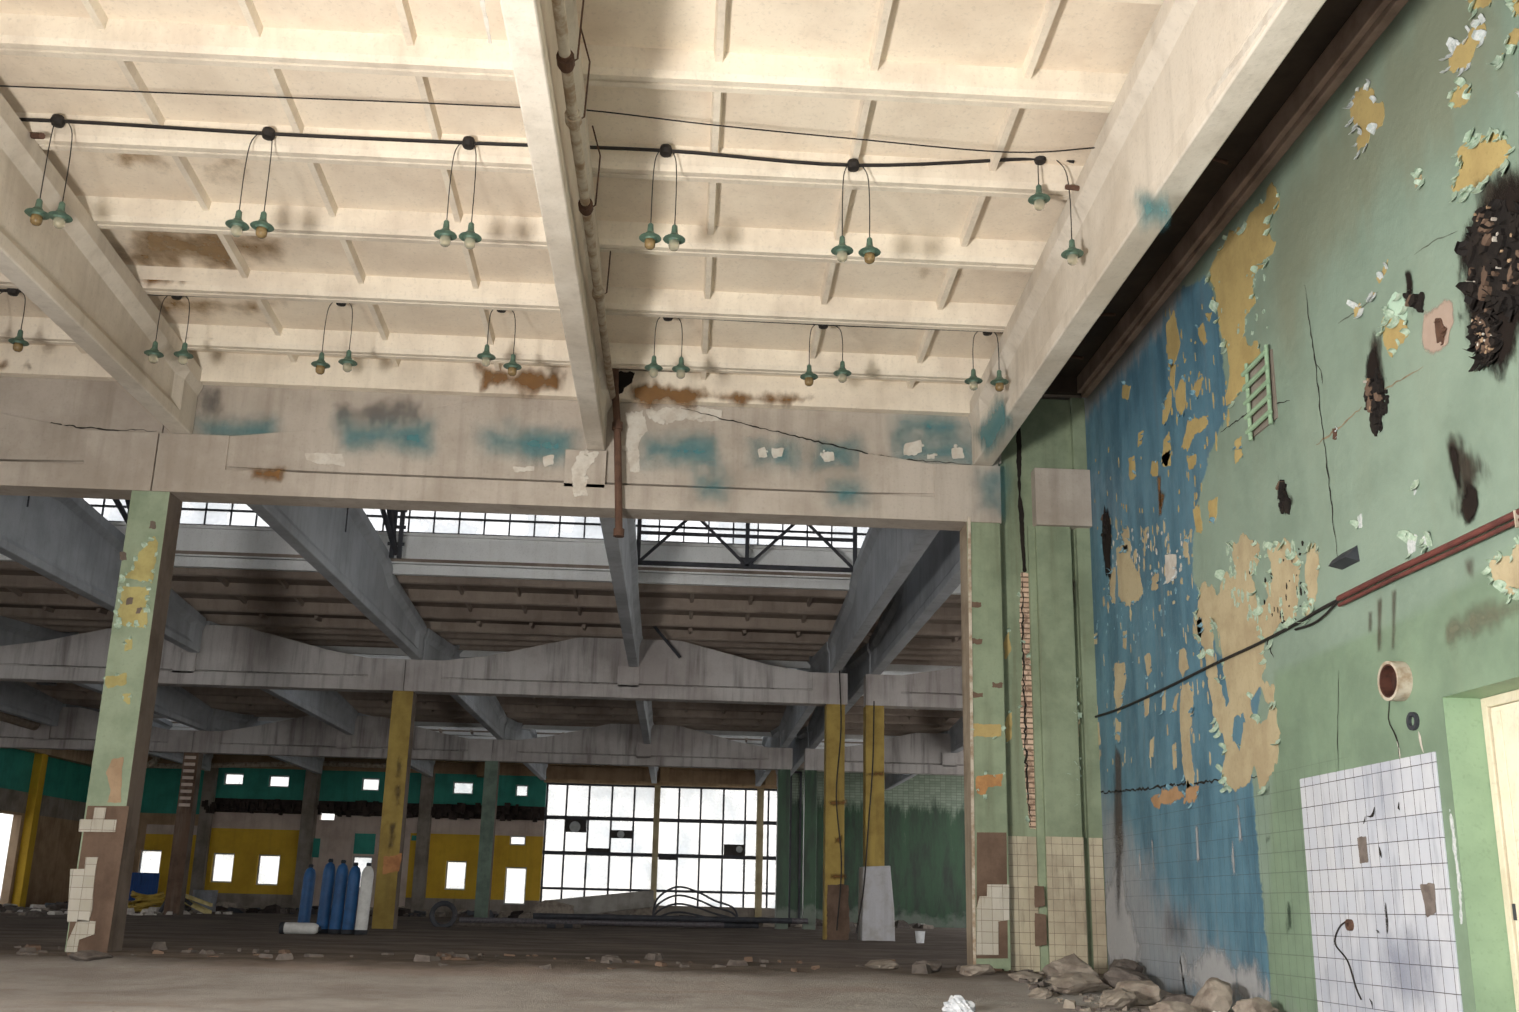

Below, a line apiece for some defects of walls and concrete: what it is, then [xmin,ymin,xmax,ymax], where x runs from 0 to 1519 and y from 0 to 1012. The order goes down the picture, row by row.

peeling [1439,0,1519,109]
peeling [1344,79,1385,160]
peeling [1346,127,1519,372]
crack [681,408,969,465]
peeling [1066,182,1320,810]
peeling [113,521,158,651]
peeling [1481,535,1519,604]
peeling [103,673,132,704]
flaking render [66,757,129,953]
flaking render [977,832,1007,904]
flaking render [976,920,1008,959]
peeling [1034,886,1047,946]